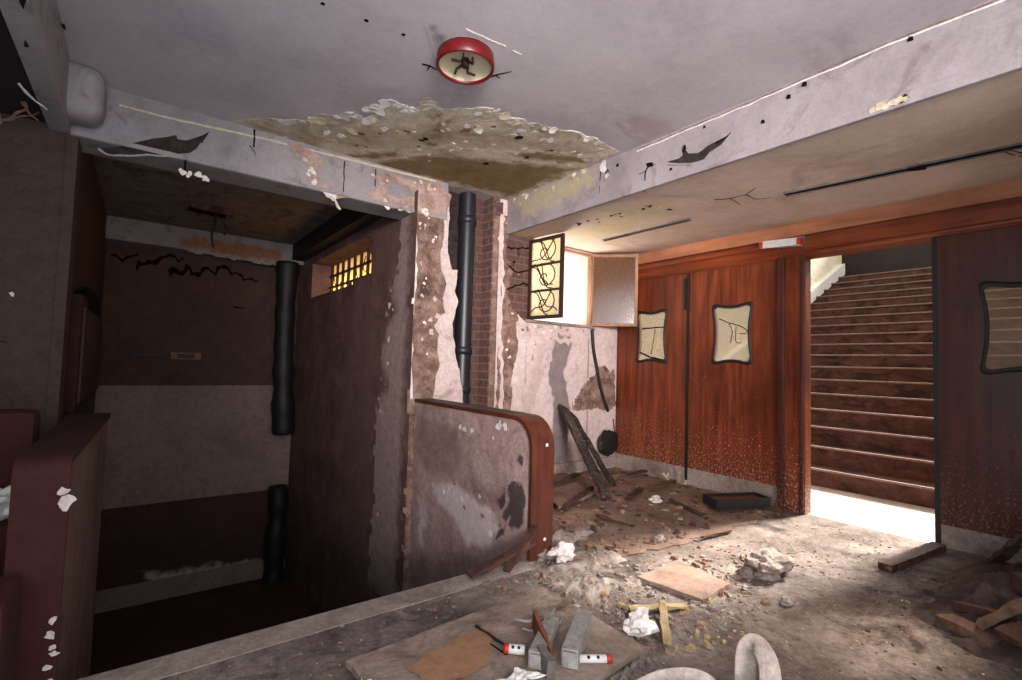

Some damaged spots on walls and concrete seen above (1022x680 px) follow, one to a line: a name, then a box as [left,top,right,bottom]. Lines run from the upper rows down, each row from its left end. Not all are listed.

crack [119,104,436,192]
peeling [226,97,619,210]
crack [637,0,1005,192]
crack [111,253,258,282]
spalling [495,202,595,410]
peeling [366,173,463,599]
spalling [572,366,616,411]